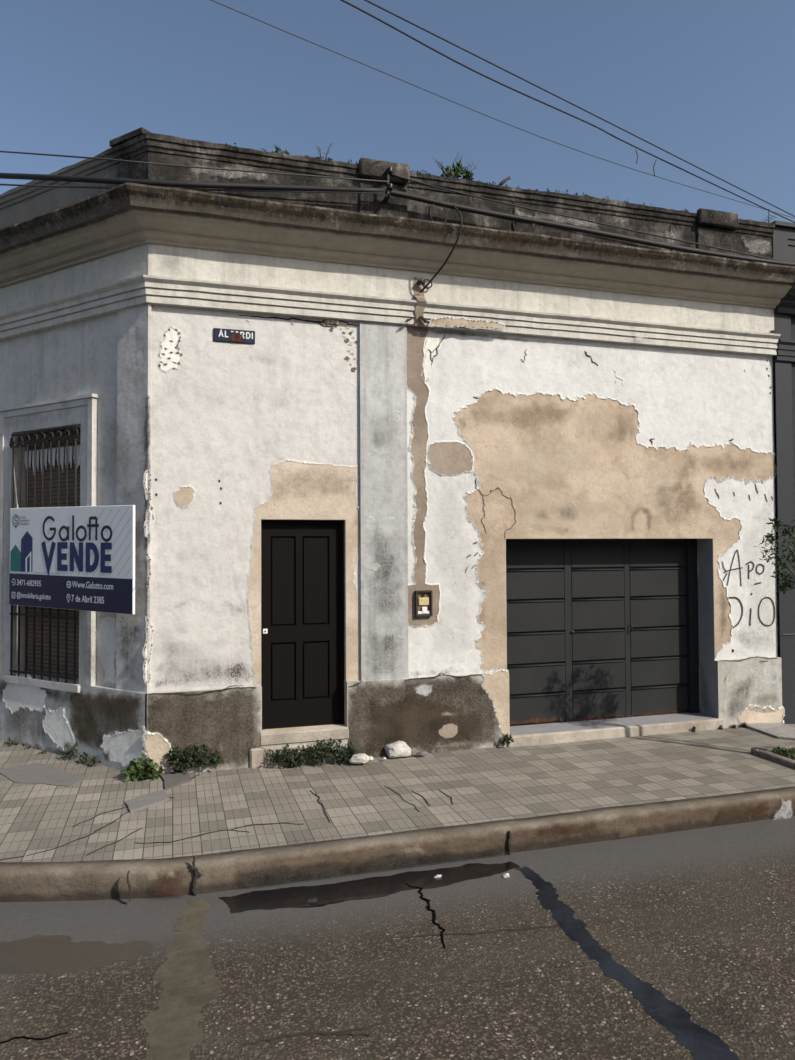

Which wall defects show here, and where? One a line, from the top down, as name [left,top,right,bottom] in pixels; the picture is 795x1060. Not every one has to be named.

peeling [158,325,183,373]
peeling [173,484,197,510]
peeling [404,316,777,743]
damp [25,664,260,766]
damp [348,670,499,758]
crack [0,1032,68,1044]